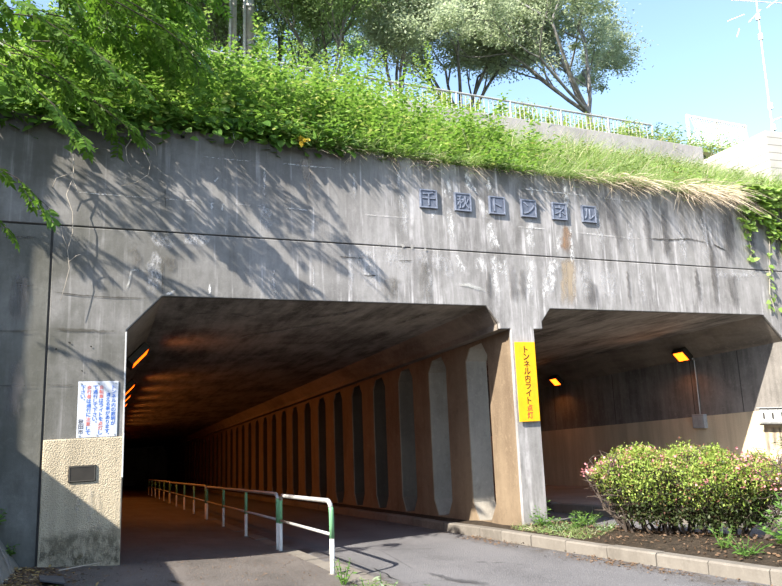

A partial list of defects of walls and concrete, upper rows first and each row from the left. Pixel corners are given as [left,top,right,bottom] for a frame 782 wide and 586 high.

crack [652,238,724,250]
water stain [725,219,734,251]
water stain [478,257,507,289]
water stain [543,237,560,297]